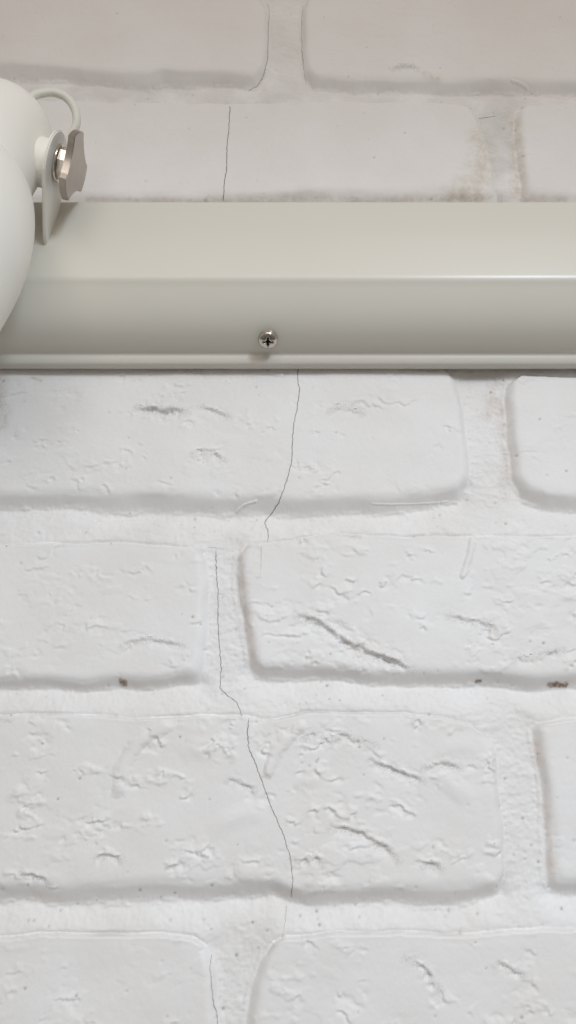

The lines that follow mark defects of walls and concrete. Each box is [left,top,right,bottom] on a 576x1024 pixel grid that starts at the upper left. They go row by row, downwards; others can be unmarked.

crack [249,8,270,91]
crack [222,111,230,199]
crack [260,369,300,573]
crack [213,547,293,938]